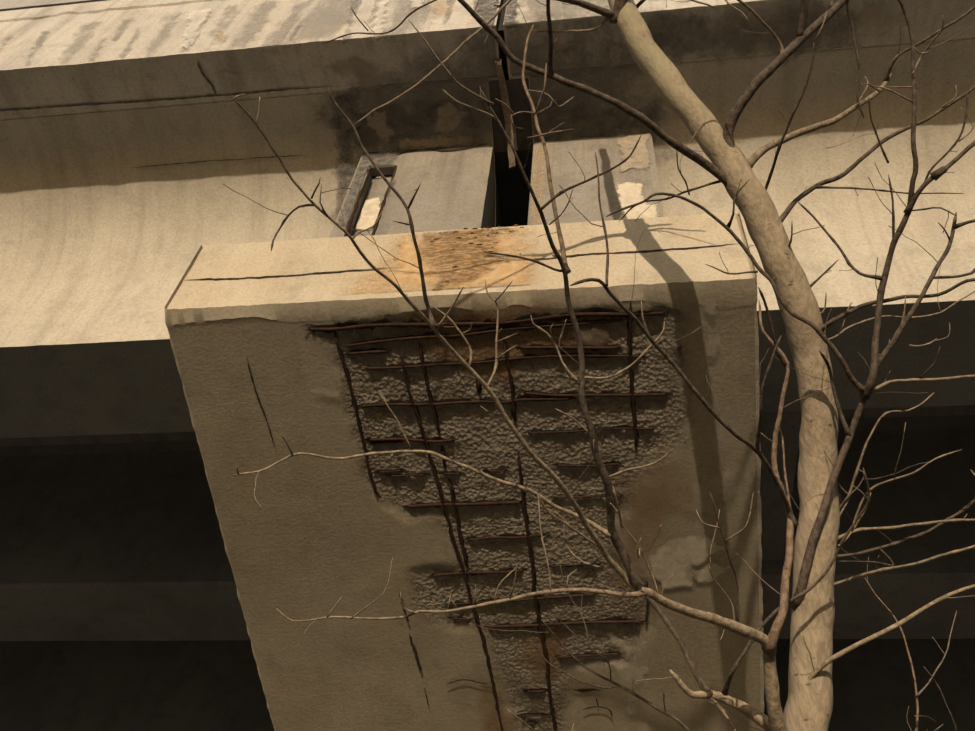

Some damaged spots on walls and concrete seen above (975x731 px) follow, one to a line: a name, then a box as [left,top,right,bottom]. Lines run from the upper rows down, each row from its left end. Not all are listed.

crack [0,61,339,111]
crack [133,154,308,168]
damp [331,93,475,225]
peeling [617,133,657,220]
crack [190,245,401,280]
rust [354,226,532,293]
crack [531,244,730,260]
crack [247,358,274,446]
spalling [306,300,686,731]